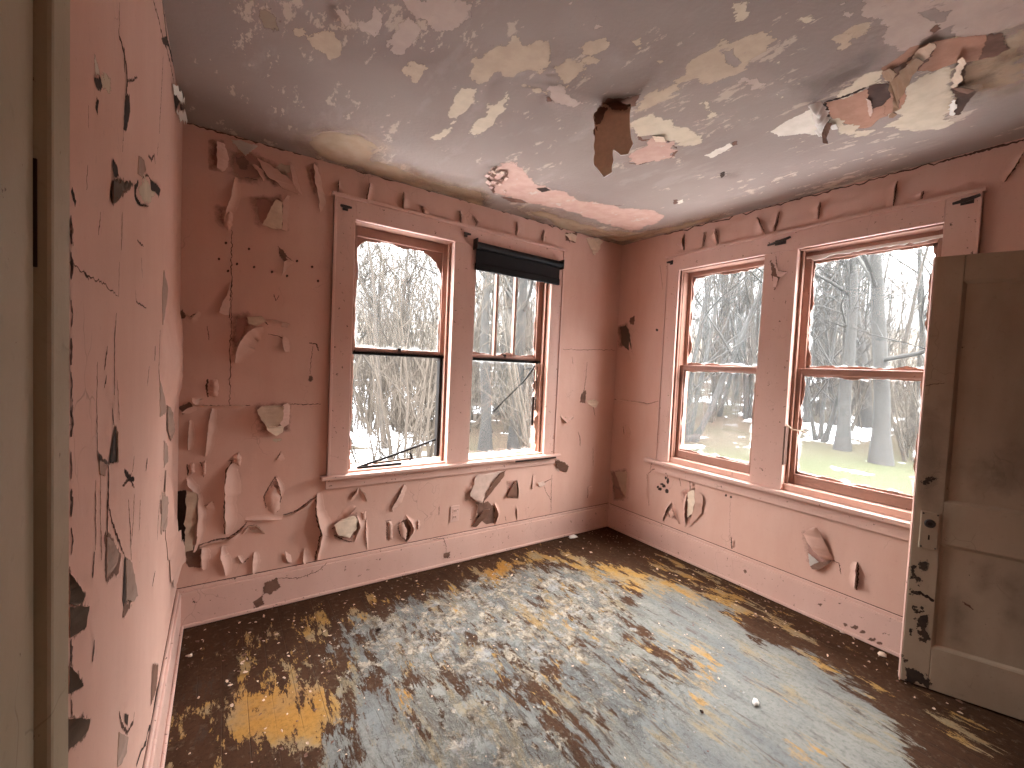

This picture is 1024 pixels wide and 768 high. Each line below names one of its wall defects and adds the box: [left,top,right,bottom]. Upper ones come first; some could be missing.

crack [71,165,88,205]
crack [118,2,137,152]
peeling [110,155,160,207]
damp [312,132,483,205]
peeling [484,161,664,231]
peeling [593,30,777,177]
peeling [771,0,1024,144]
crack [69,212,147,578]
peeling [68,454,90,752]
peeling [104,503,138,617]
peeling [157,381,282,587]
peeling [463,458,569,527]